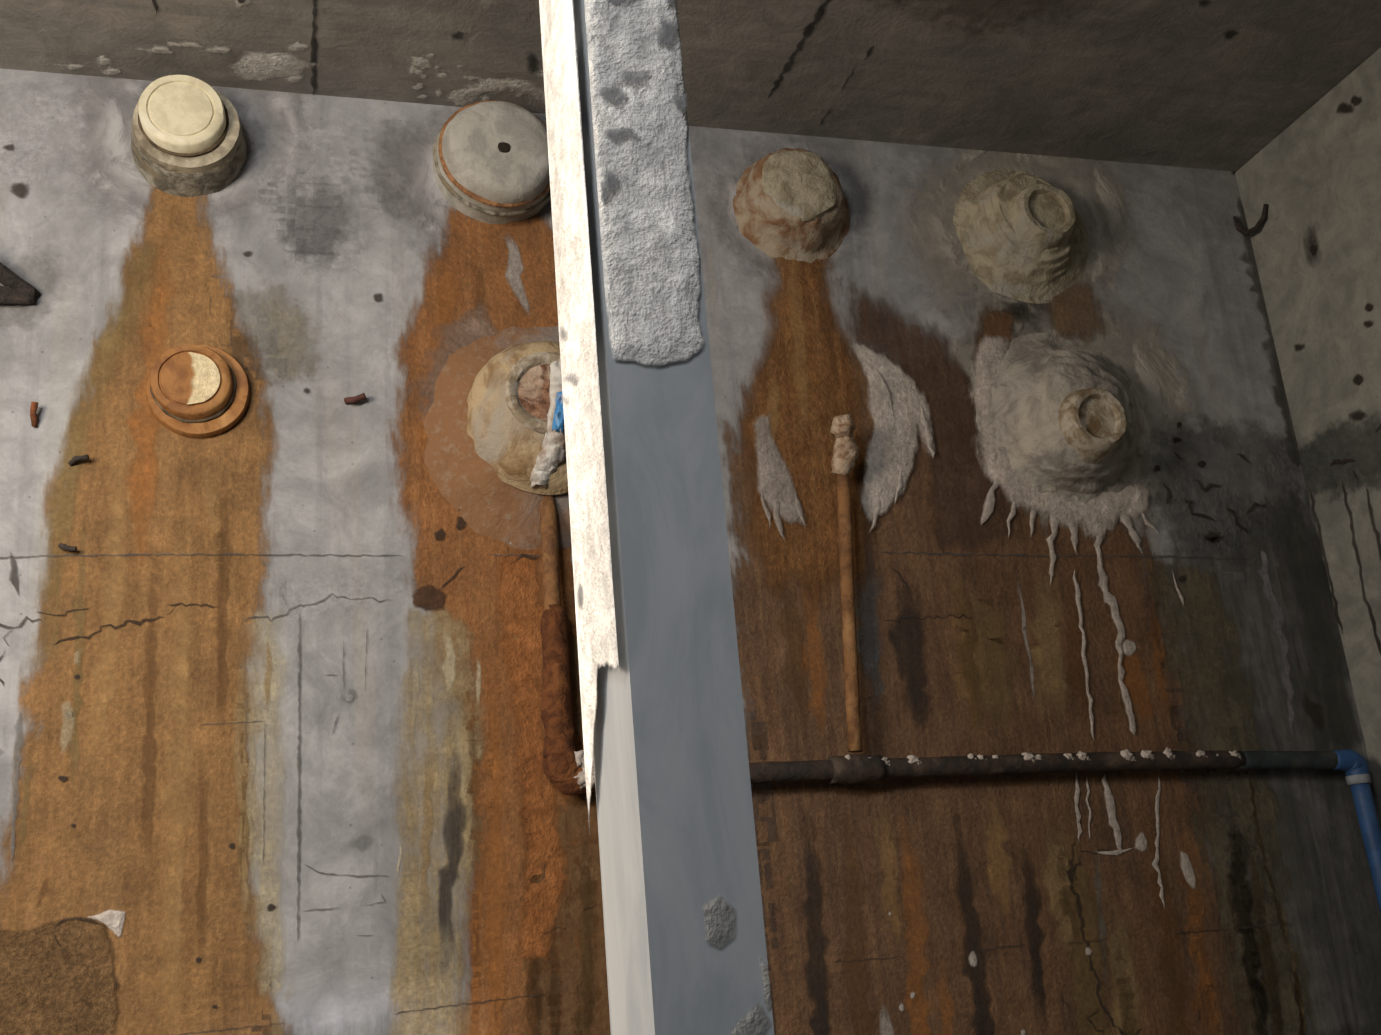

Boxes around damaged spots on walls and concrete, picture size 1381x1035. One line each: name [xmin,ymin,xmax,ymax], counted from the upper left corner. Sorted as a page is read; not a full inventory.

corrosion [0,186,289,1035]
crack [0,593,388,686]
corrosion [392,100,611,1035]
damp [853,344,935,531]
corrosion [724,257,1259,763]
damp [971,337,1175,908]
spalling [0,910,125,1035]
corrosion [751,769,1316,1035]